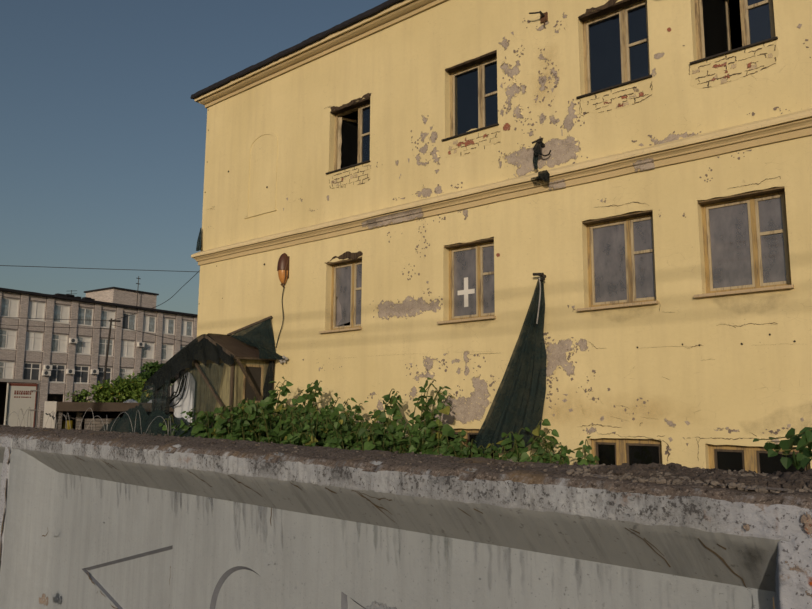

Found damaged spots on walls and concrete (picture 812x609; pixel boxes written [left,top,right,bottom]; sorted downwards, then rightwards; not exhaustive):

flaking render [689,41,779,88]
peeling [395,32,665,179]
flaking render [326,162,378,201]
peeling [361,182,463,257]
peeling [373,281,443,321]
peeling [405,351,499,432]
peeling [543,332,599,416]